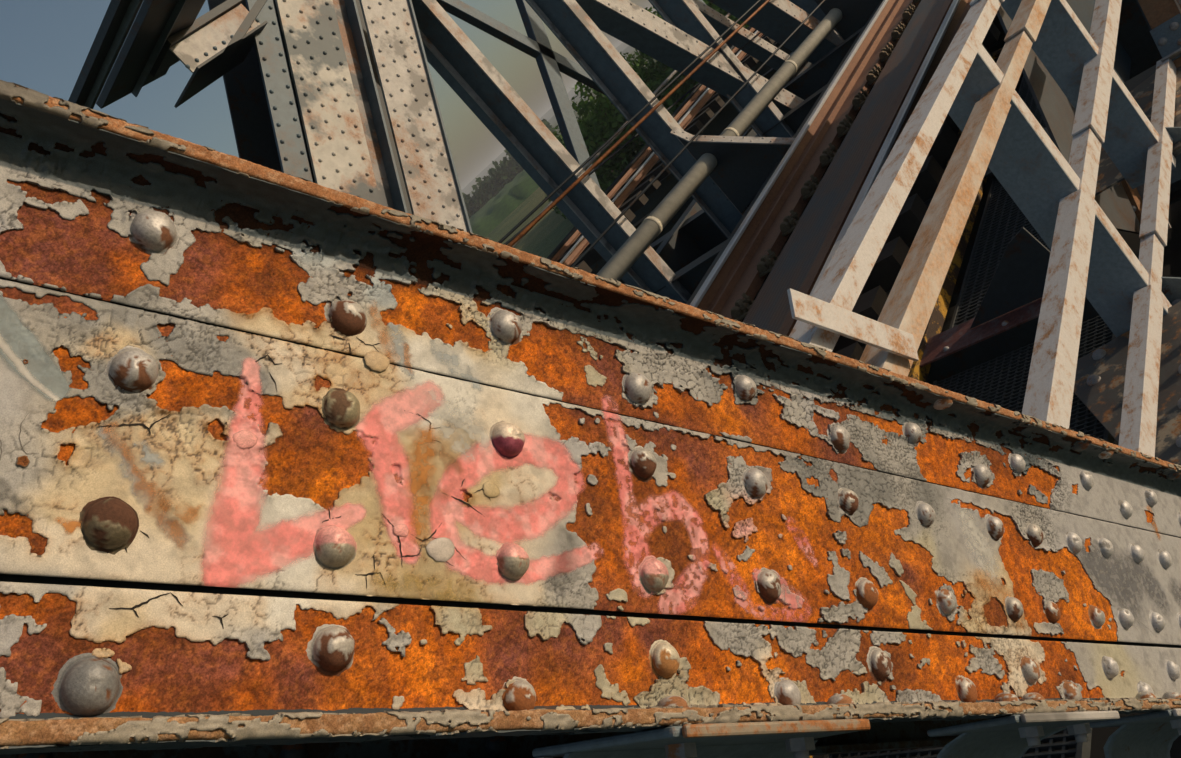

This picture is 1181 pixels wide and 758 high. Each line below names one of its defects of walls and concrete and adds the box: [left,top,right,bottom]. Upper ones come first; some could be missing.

peeling [0,113,107,158]
peeling [44,96,69,110]
peeling [0,180,327,328]
peeling [69,109,968,408]
rust [410,430,435,535]
peeling [0,320,1133,747]
peeling [915,399,1181,509]
crack [109,592,183,617]
peeling [1139,698,1181,709]